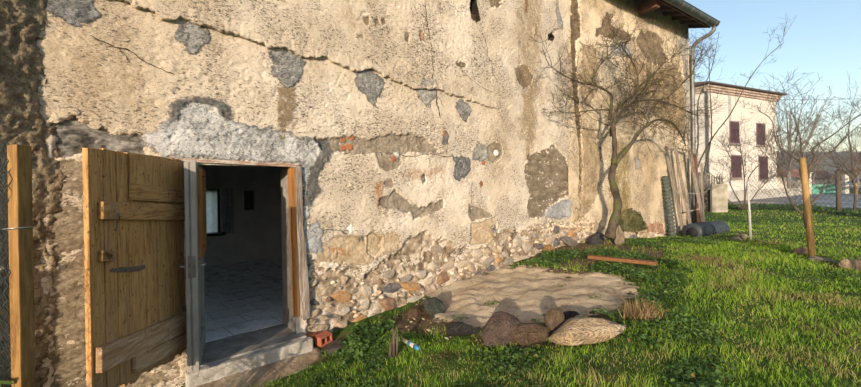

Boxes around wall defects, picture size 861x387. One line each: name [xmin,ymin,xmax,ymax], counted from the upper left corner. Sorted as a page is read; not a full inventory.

crack [90,35,175,75]
crack [423,6,443,119]
spalling [524,0,686,219]
peeling [316,232,400,265]
peeling [468,204,498,249]